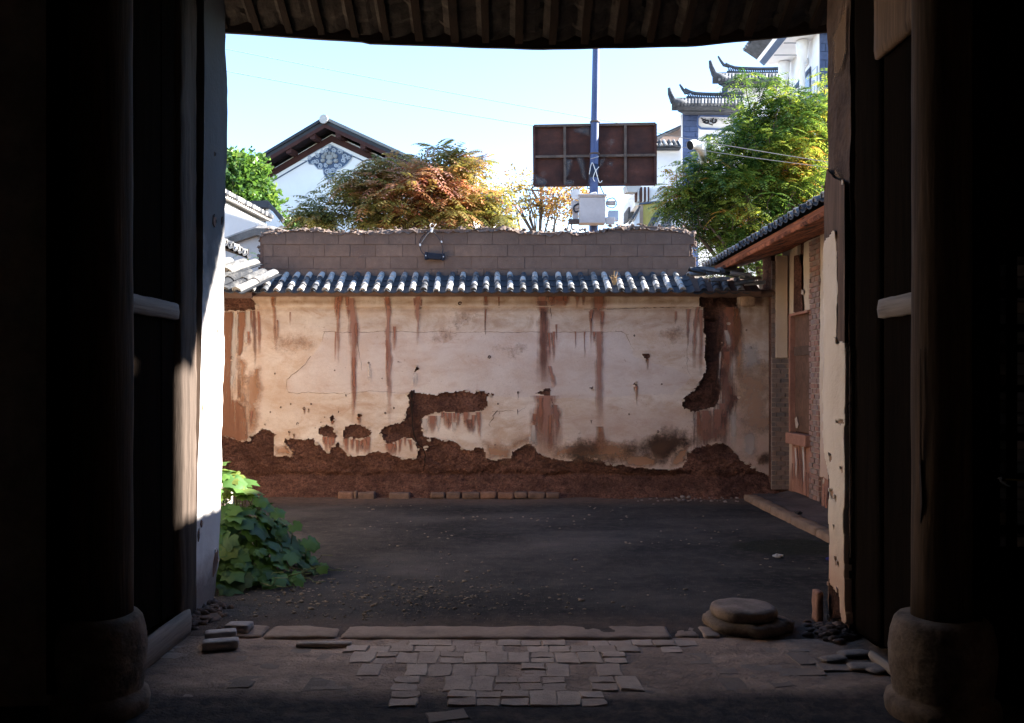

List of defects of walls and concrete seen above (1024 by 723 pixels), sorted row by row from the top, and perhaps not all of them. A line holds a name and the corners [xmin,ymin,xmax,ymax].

spalling [681,297,737,412]
spalling [221,389,780,500]